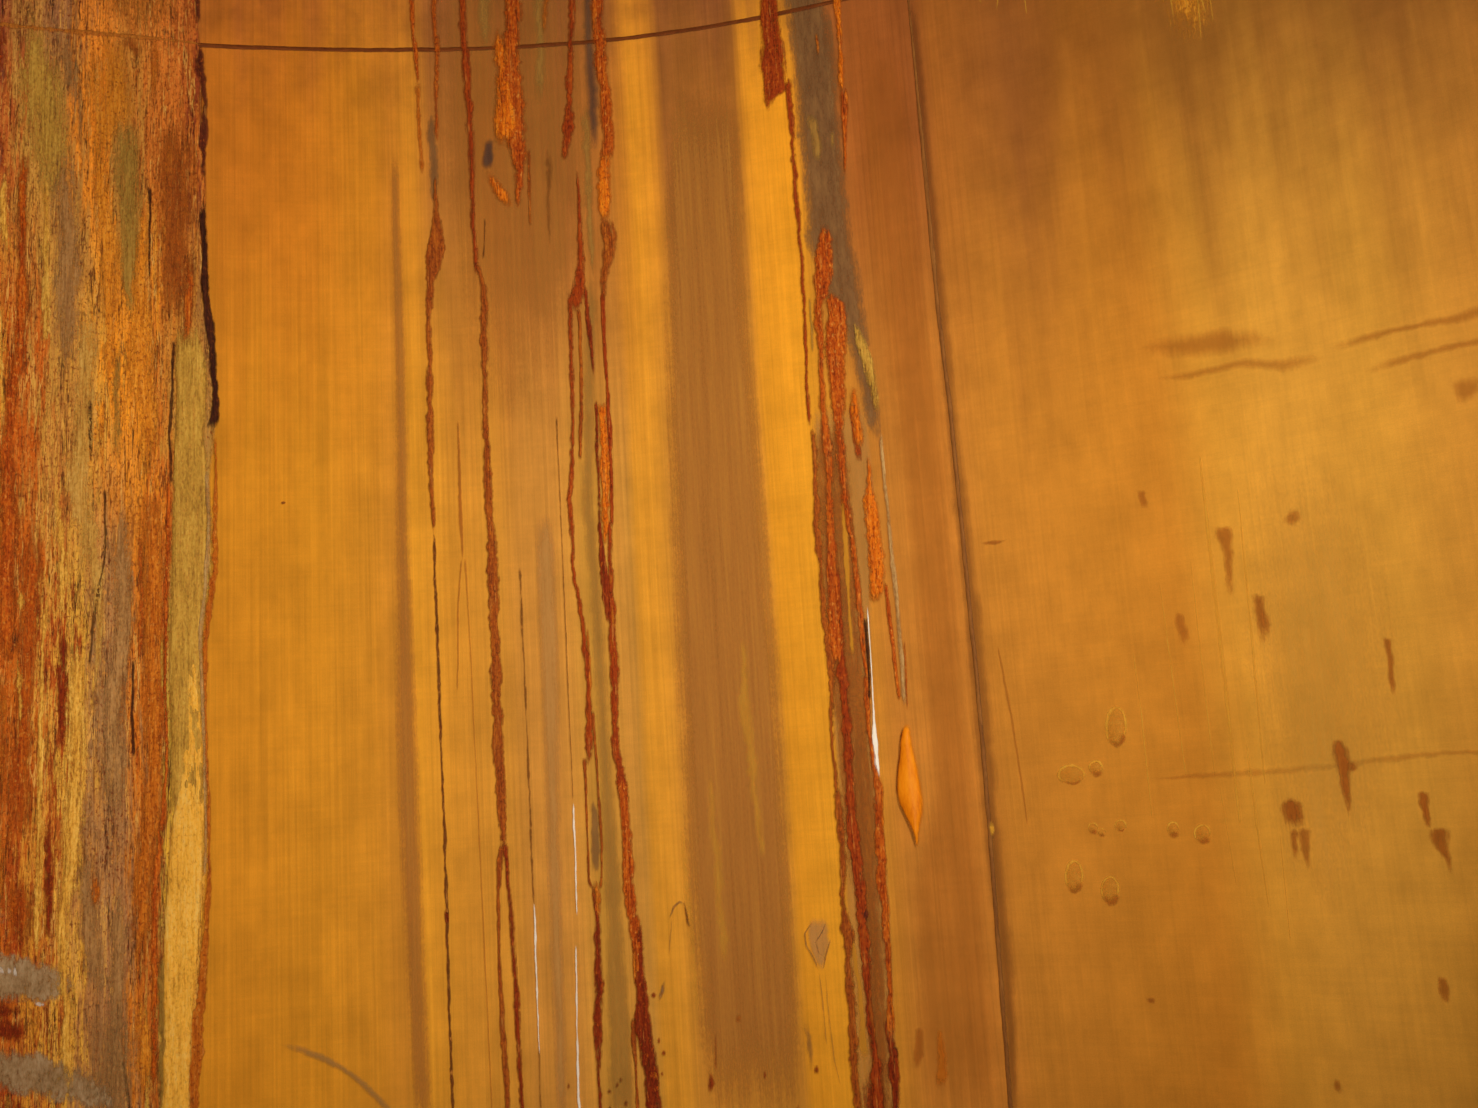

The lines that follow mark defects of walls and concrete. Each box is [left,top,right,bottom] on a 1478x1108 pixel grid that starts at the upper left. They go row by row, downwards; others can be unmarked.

corrosion [0,0,220,1108]
corrosion [410,0,454,1108]
corrosion [458,0,524,1108]
corrosion [562,0,665,1108]
damp [667,108,795,1091]
corrosion [760,0,900,1108]
corrosion [1256,597,1268,629]
corrosion [1283,800,1307,854]
corrosion [1334,741,1355,802]